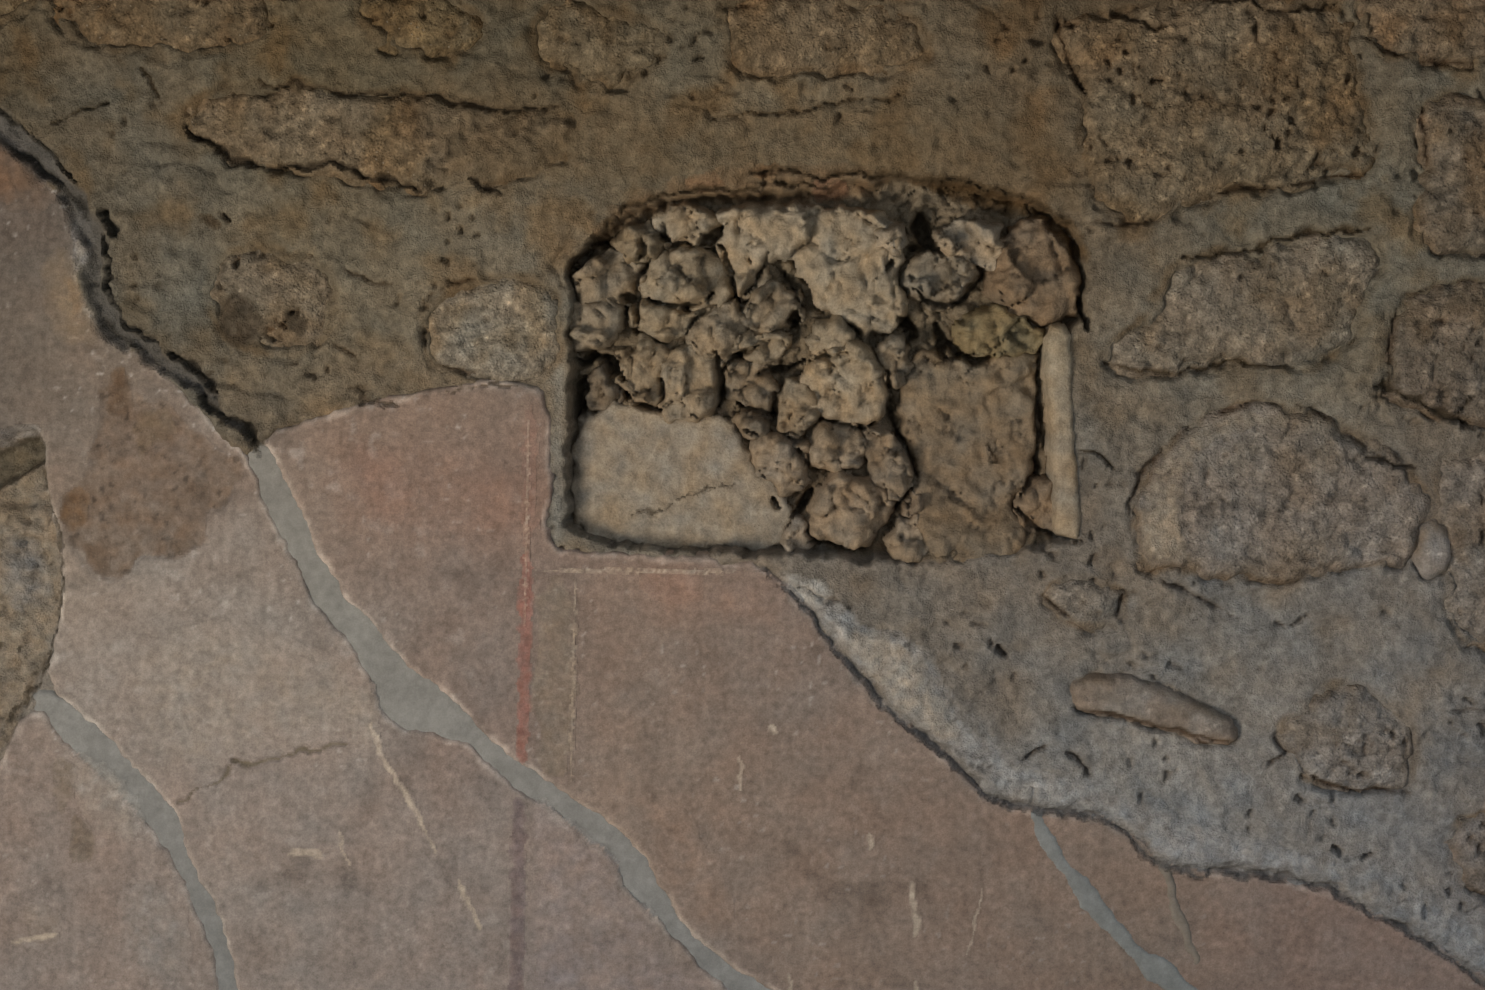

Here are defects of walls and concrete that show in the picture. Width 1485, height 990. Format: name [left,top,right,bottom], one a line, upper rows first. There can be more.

spalling [590,160,892,250]
spalling [213,290,308,350]
flaking render [0,364,244,752]